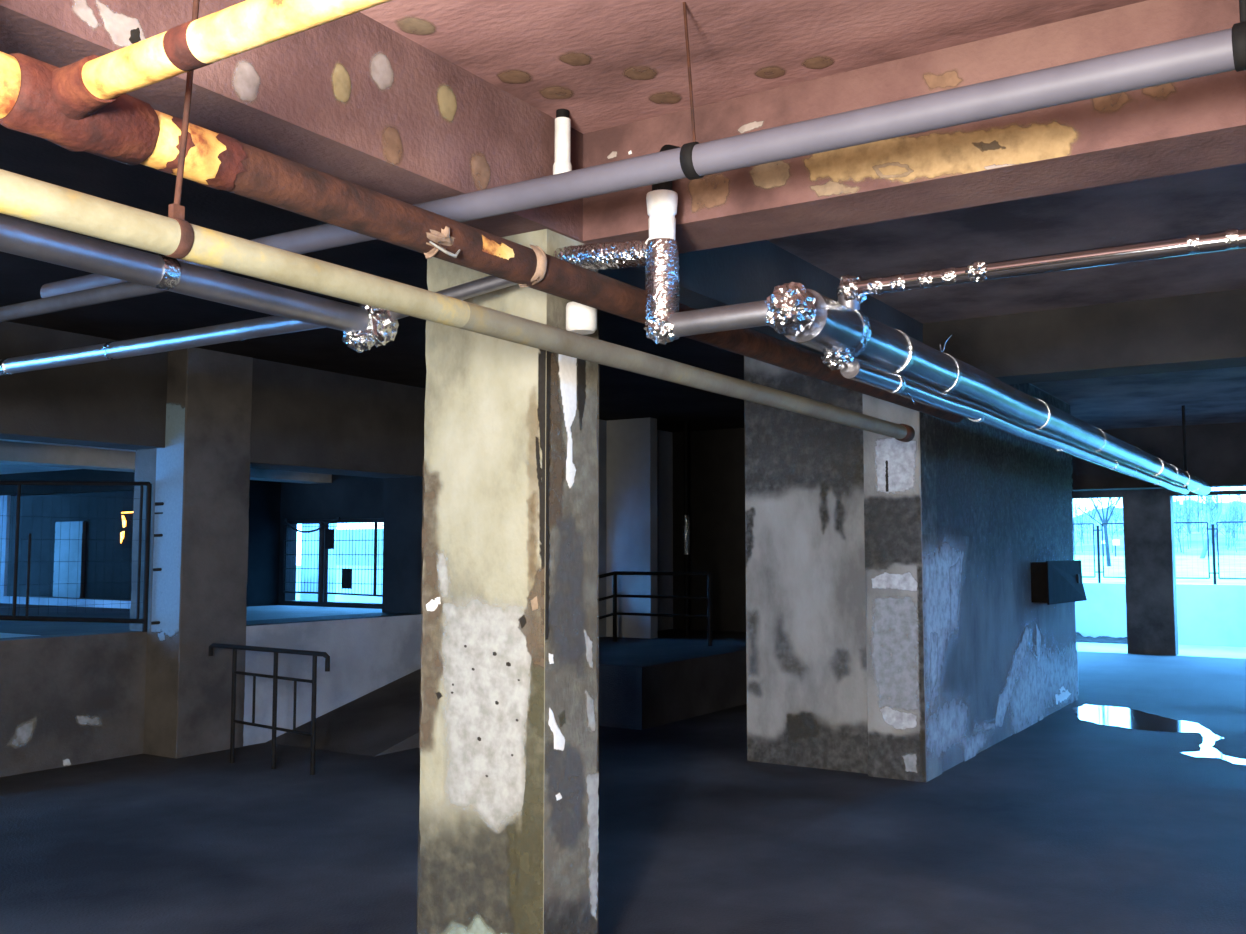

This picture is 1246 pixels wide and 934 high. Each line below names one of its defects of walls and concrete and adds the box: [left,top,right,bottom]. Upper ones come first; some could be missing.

corrosion [156,115,195,174]
spalling [750,161,790,189]
spalling [804,121,1077,196]
corrosion [197,129,646,324]
corrosion [683,328,964,423]
damp [747,546,1079,782]